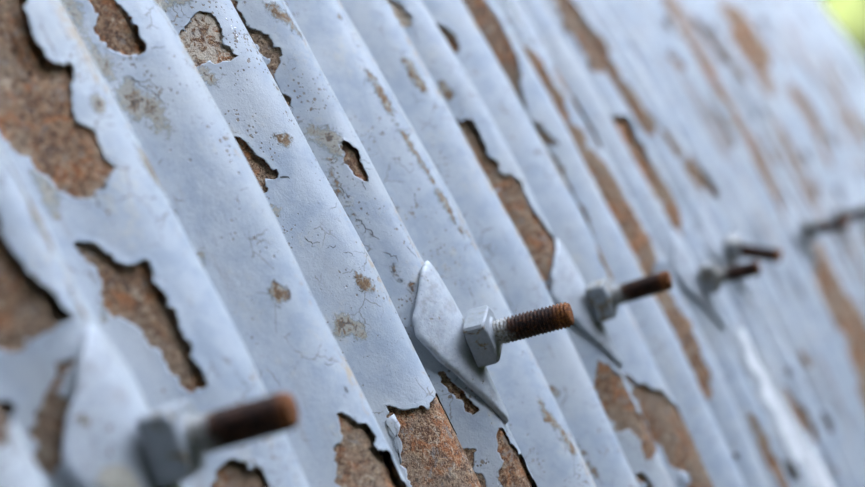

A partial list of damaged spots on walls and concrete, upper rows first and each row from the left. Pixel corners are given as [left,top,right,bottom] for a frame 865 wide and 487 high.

peeling [0,0,122,205]
peeling [81,0,154,61]
peeling [175,0,299,116]
peeling [450,109,555,293]
peeling [463,0,668,277]
peeling [551,0,720,246]
peeling [0,199,86,483]
peeling [70,235,215,399]
peeling [205,451,277,487]
peeling [324,368,538,487]
peeling [591,358,714,487]
peeling [654,290,714,403]